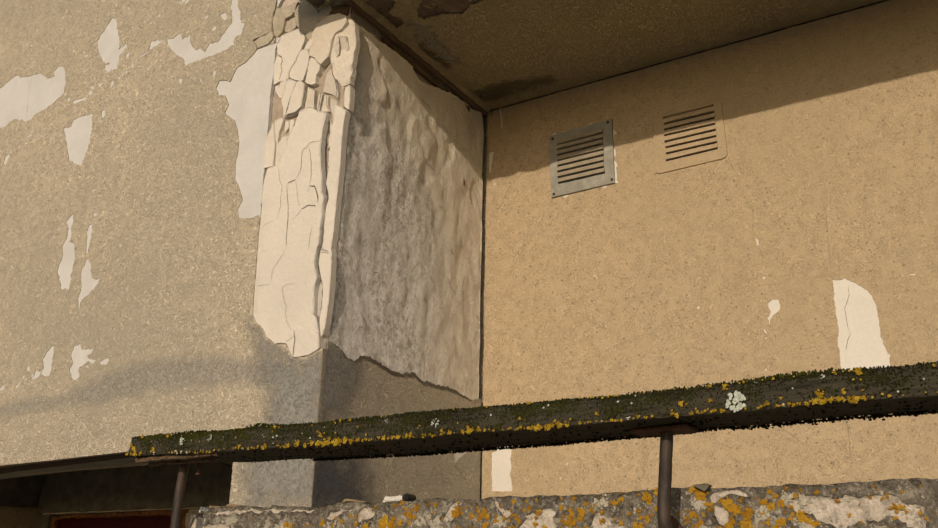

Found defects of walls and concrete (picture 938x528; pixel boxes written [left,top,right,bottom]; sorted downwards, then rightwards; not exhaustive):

peeling [0,0,244,128]
peeling [55,110,105,165]
crack [259,30,340,364]
flaking render [213,0,494,401]
peeling [57,213,99,308]
peeling [0,346,54,391]
peeling [70,344,109,380]
peeling [832,278,890,370]